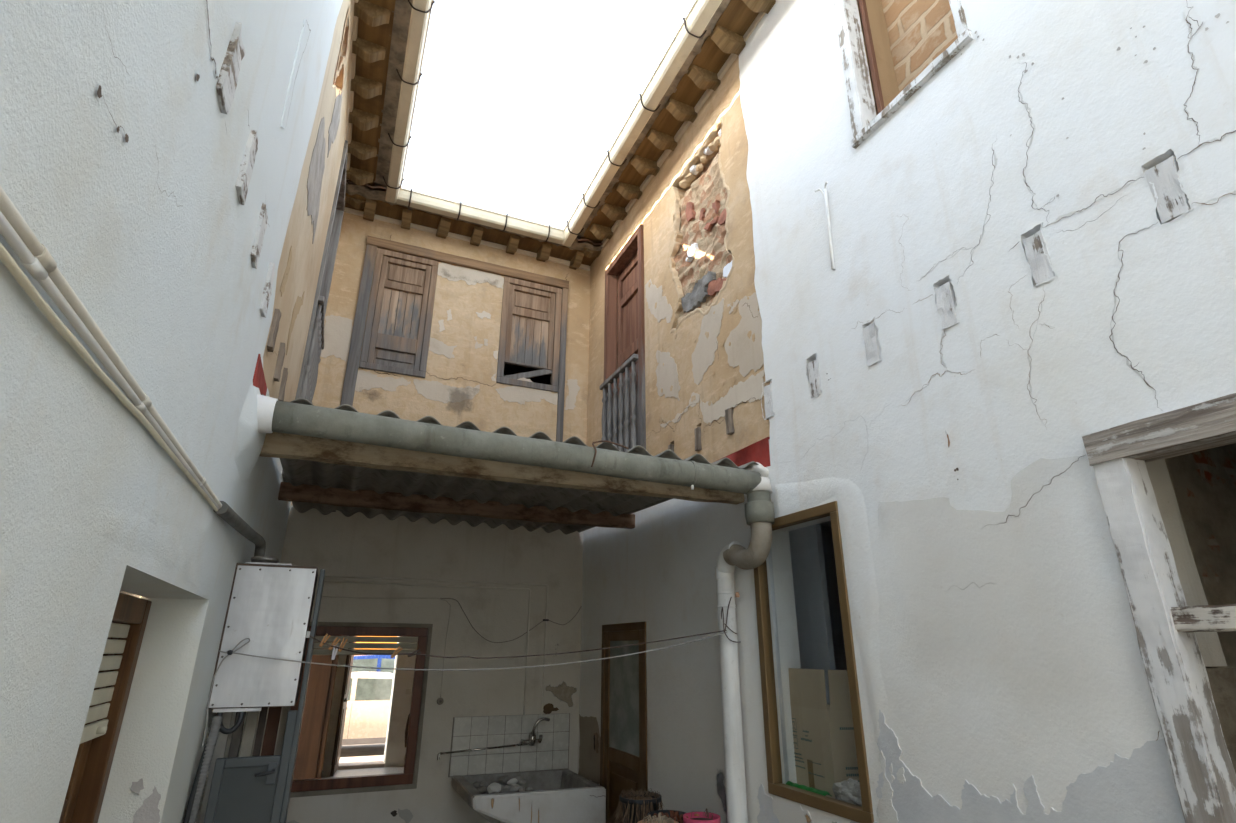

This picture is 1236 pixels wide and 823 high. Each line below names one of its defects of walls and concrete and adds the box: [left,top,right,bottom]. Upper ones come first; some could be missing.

crack [1178,0,1236,159]
spalling [645,114,774,429]
crack [801,274,1055,459]
crack [855,63,1142,329]
crack [1109,222,1158,406]
crack [980,456,1082,530]
peeling [131,778,161,823]
peeling [543,682,601,784]
peeling [757,784,813,823]
peeling [873,709,1185,823]